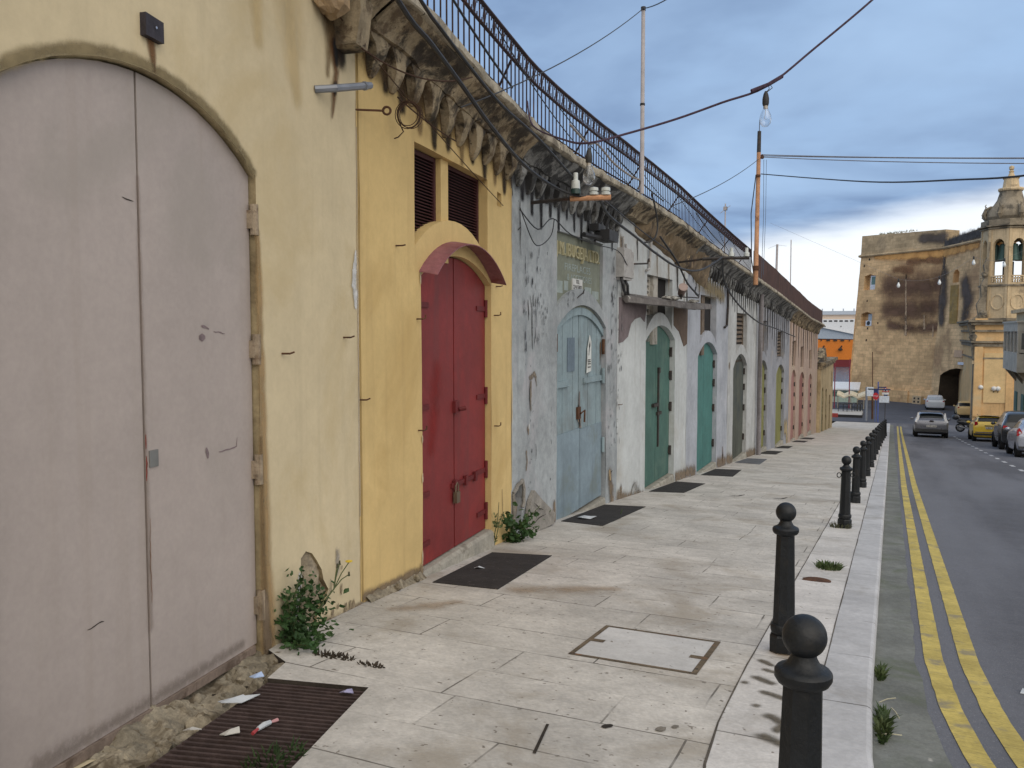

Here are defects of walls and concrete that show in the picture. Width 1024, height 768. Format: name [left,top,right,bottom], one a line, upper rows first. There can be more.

rust [148,39,156,72]
damp [874,243,979,337]
peeling [527,372,537,435]